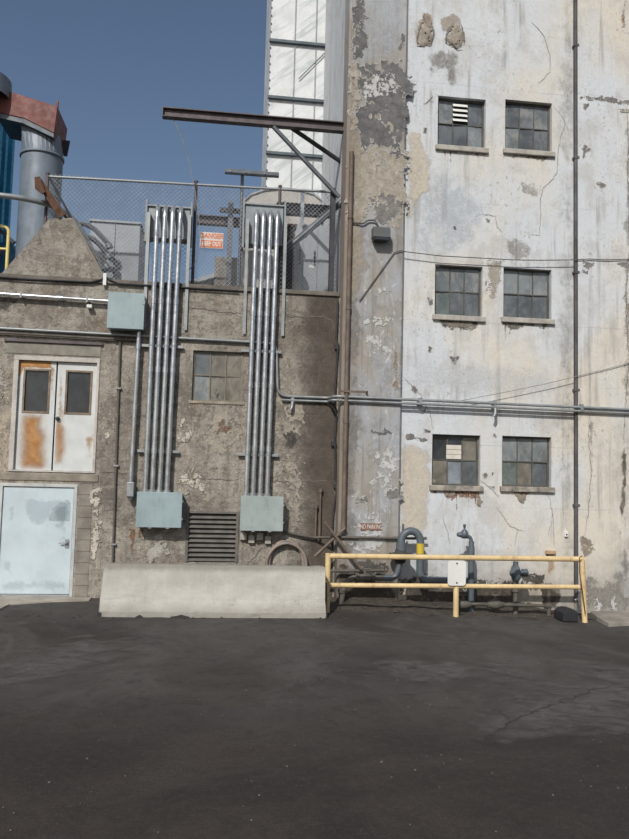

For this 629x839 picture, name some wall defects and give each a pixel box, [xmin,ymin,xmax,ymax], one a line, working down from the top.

peeling [344,0,465,232]
rust [19,361,54,381]
rust [23,417,43,467]
peeling [369,470,404,501]